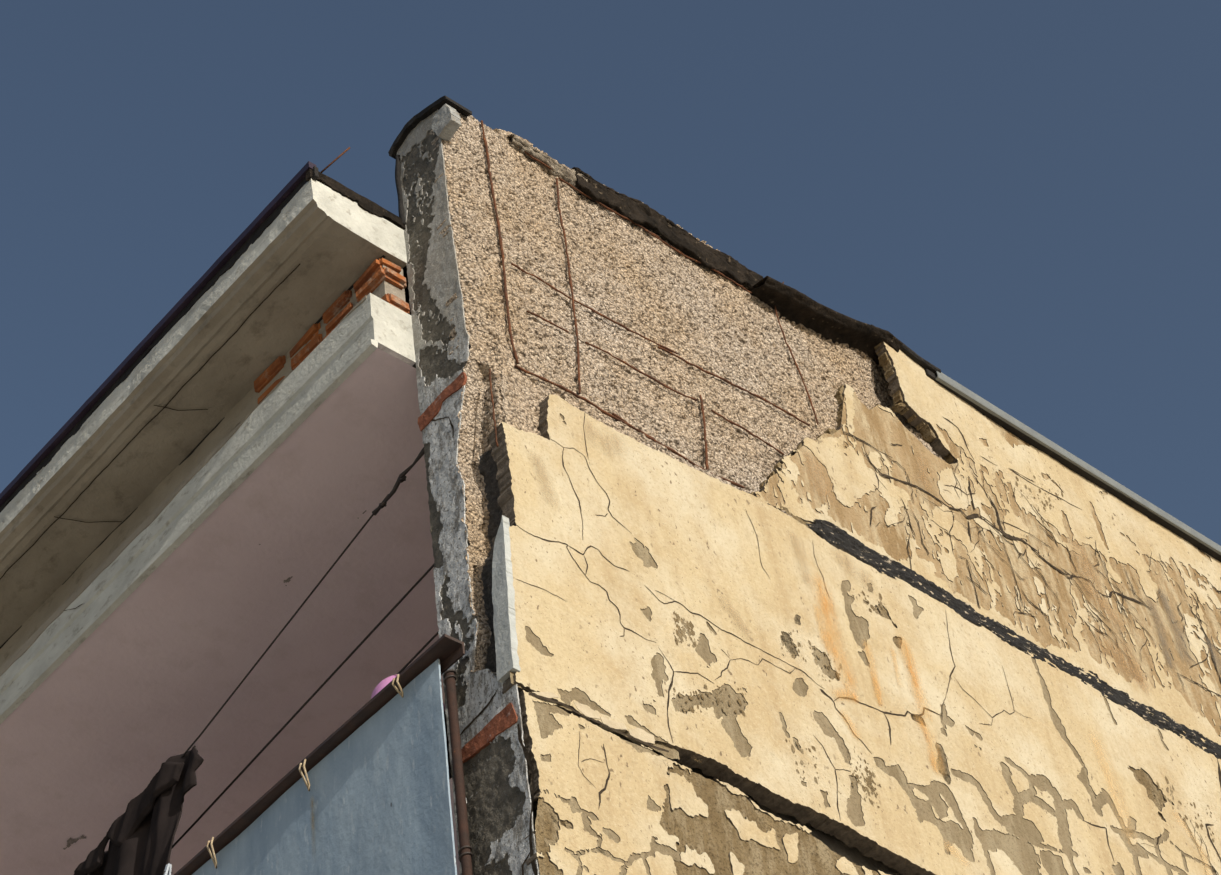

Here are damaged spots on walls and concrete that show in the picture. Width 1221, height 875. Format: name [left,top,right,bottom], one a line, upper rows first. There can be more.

crack [0,264,300,580]
spalling [401,113,1221,739]
peeling [0,411,252,676]
crack [517,723,537,875]
peeling [463,736,879,875]
peeling [625,653,751,757]
crack [517,416,1032,821]
peeling [779,713,830,808]
peeling [813,658,1221,875]
crack [844,417,1221,696]
crack [1083,820,1133,874]
crack [1142,823,1221,875]